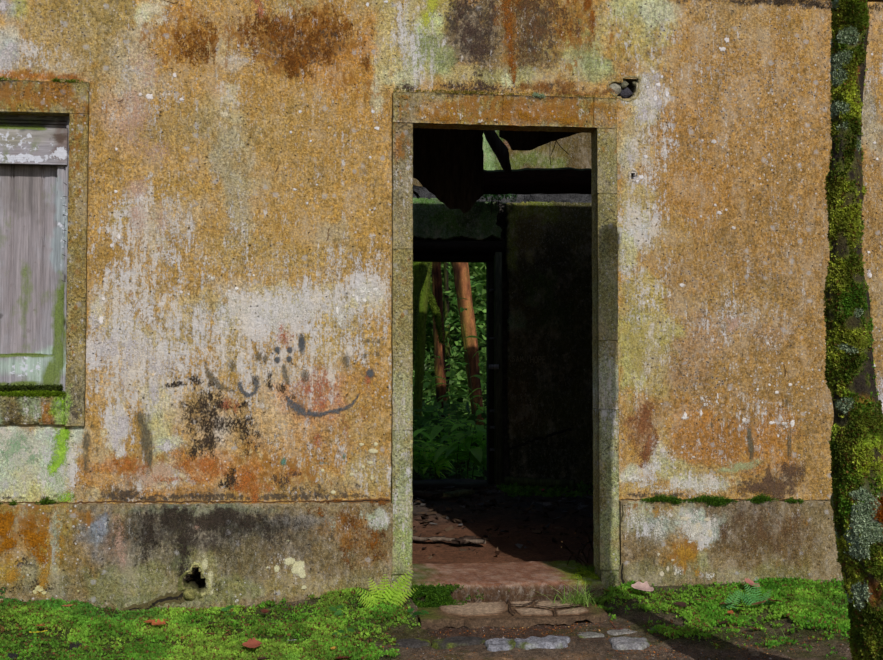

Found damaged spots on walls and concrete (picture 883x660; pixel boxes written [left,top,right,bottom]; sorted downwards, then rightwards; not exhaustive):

corrosion [236,0,358,80]
leakage [423,0,499,82]
leakage [510,0,591,69]
leakage [732,0,831,9]
leakage [87,311,265,461]
leakage [110,411,177,487]
spalling [177,555,214,601]
leakage [135,498,388,582]